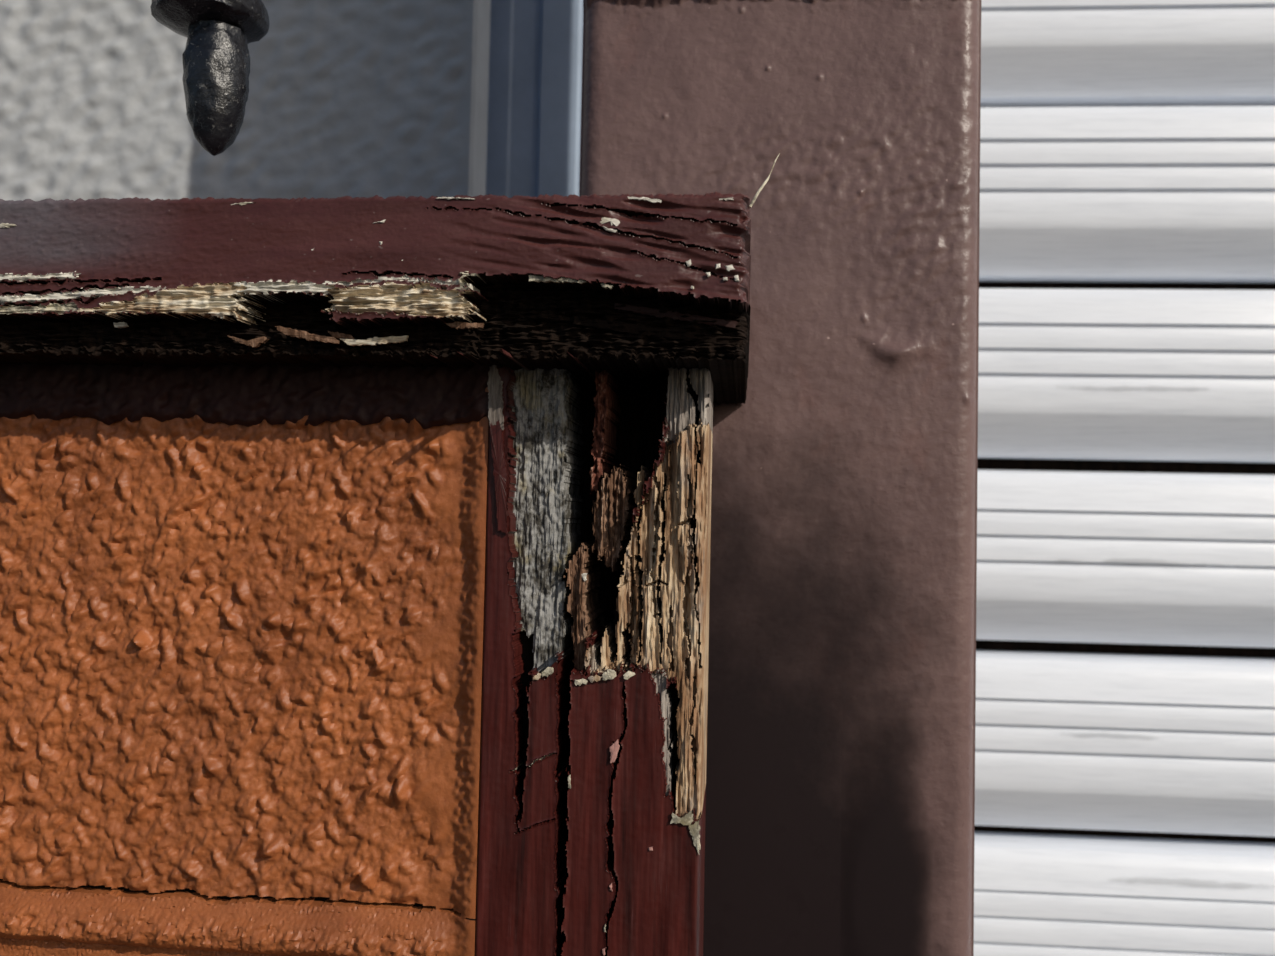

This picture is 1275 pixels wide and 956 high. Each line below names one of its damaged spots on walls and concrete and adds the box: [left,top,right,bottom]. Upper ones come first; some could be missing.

peeling [600,217,620,233]
spalling [0,260,751,685]
crack [511,374,597,875]
peeling [670,811,701,854]